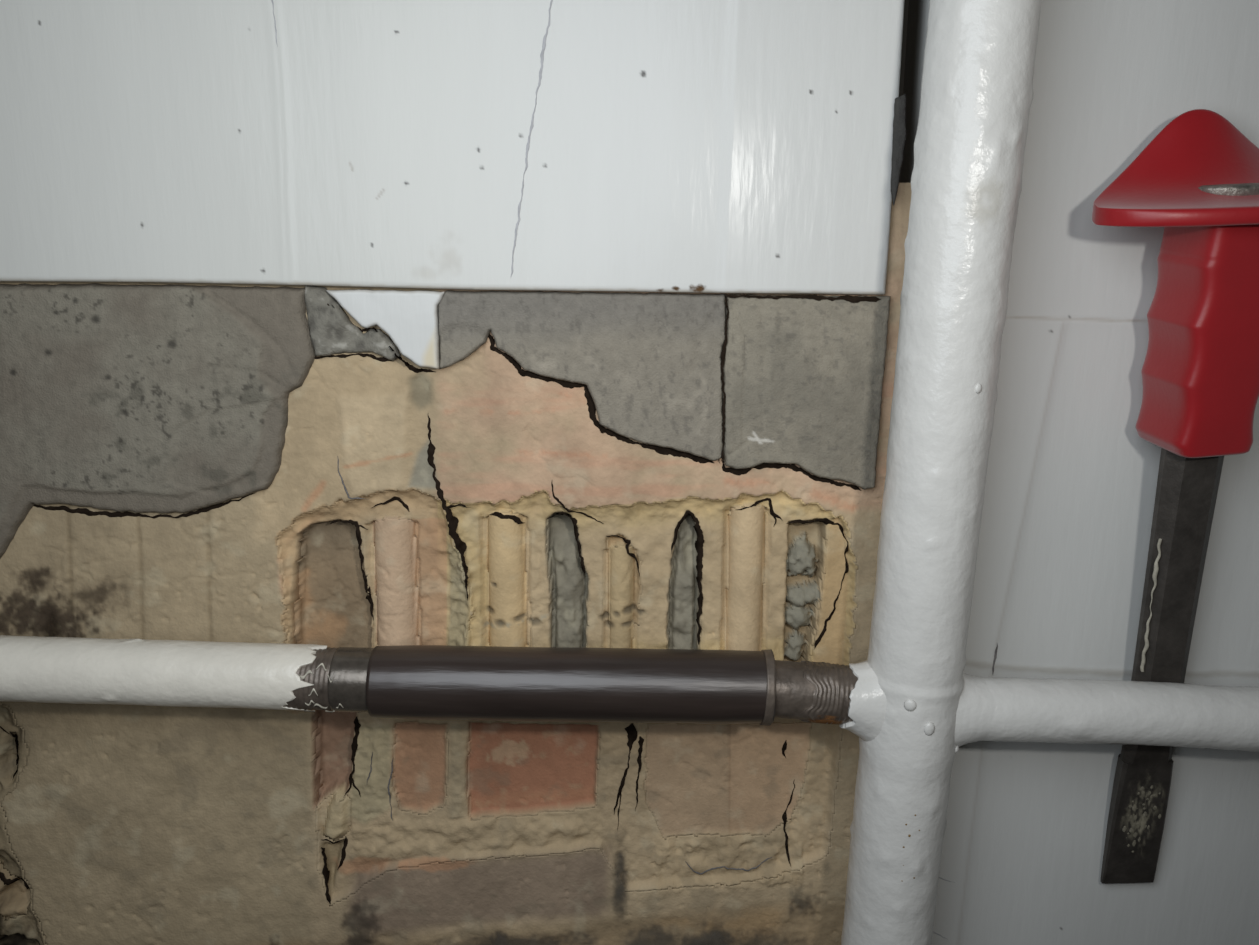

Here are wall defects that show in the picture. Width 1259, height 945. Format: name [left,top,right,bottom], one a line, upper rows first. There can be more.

water stain [0,569,107,638]
crack [330,459,409,620]
crack [427,416,640,600]
spalling [276,488,858,665]
crack [0,872,31,899]
spalling [0,703,47,945]
crack [321,836,348,904]
water stain [344,905,375,945]
water stain [481,932,559,945]
spalling [299,663,842,906]
crack [614,723,644,829]
water stain [630,930,734,945]